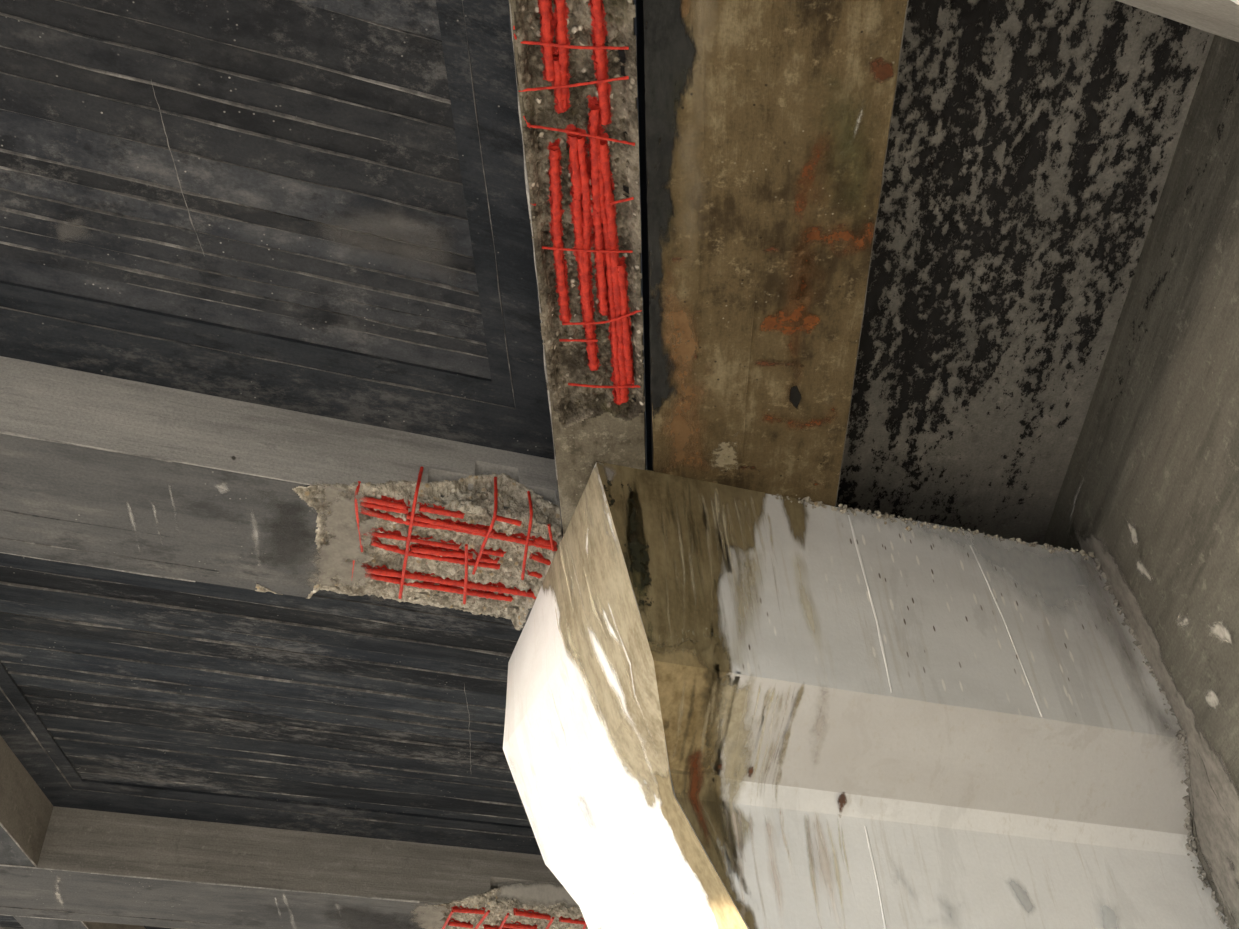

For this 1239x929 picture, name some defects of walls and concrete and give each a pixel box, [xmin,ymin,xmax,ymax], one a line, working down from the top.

crack [151,81,204,254]
spalling [513,0,645,429]
rust [755,222,874,366]
water stain [837,0,1209,531]
spalling [292,466,563,630]
water stain [782,496,807,544]
water stain [542,442,778,929]
spalling [410,884,588,929]